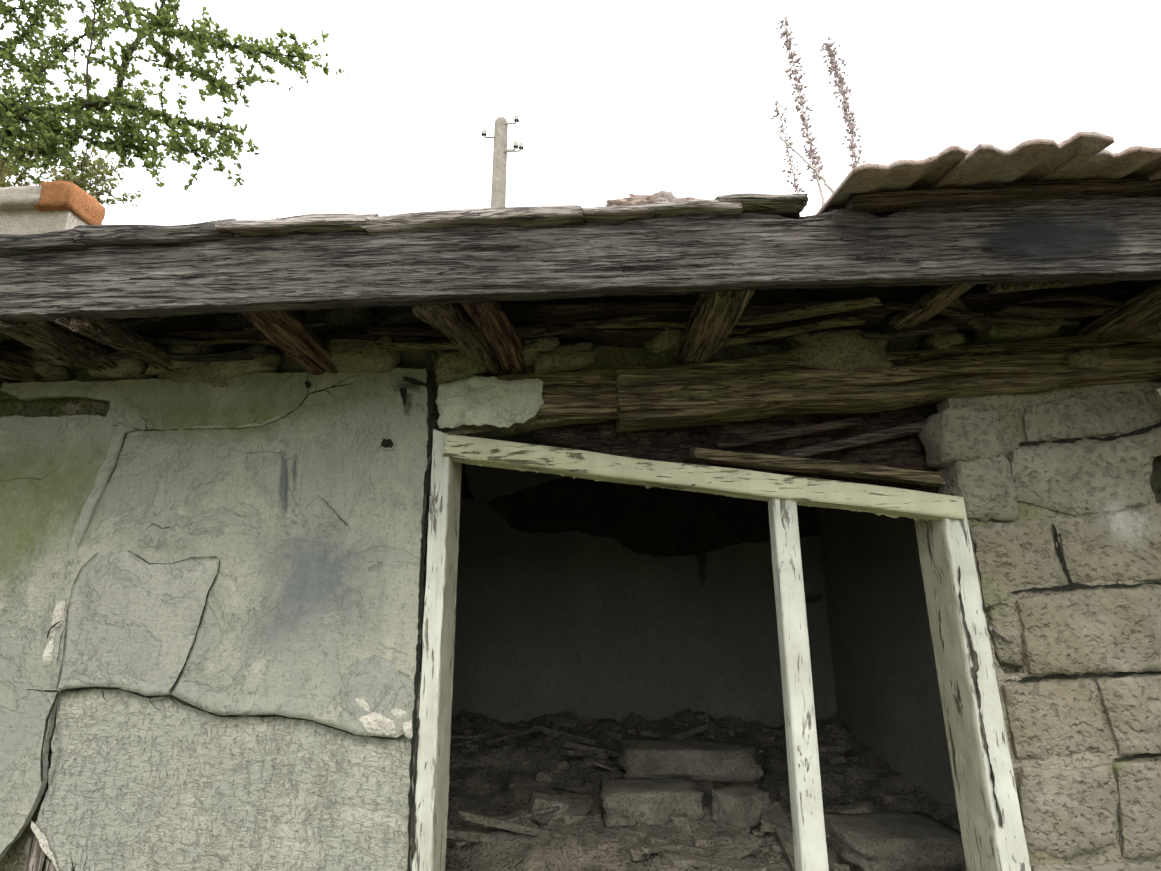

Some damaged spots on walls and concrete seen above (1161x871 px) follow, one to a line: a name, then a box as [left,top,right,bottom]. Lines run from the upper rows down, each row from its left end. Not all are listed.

crack [26,374,434,871]
spalling [1150,455,1161,504]